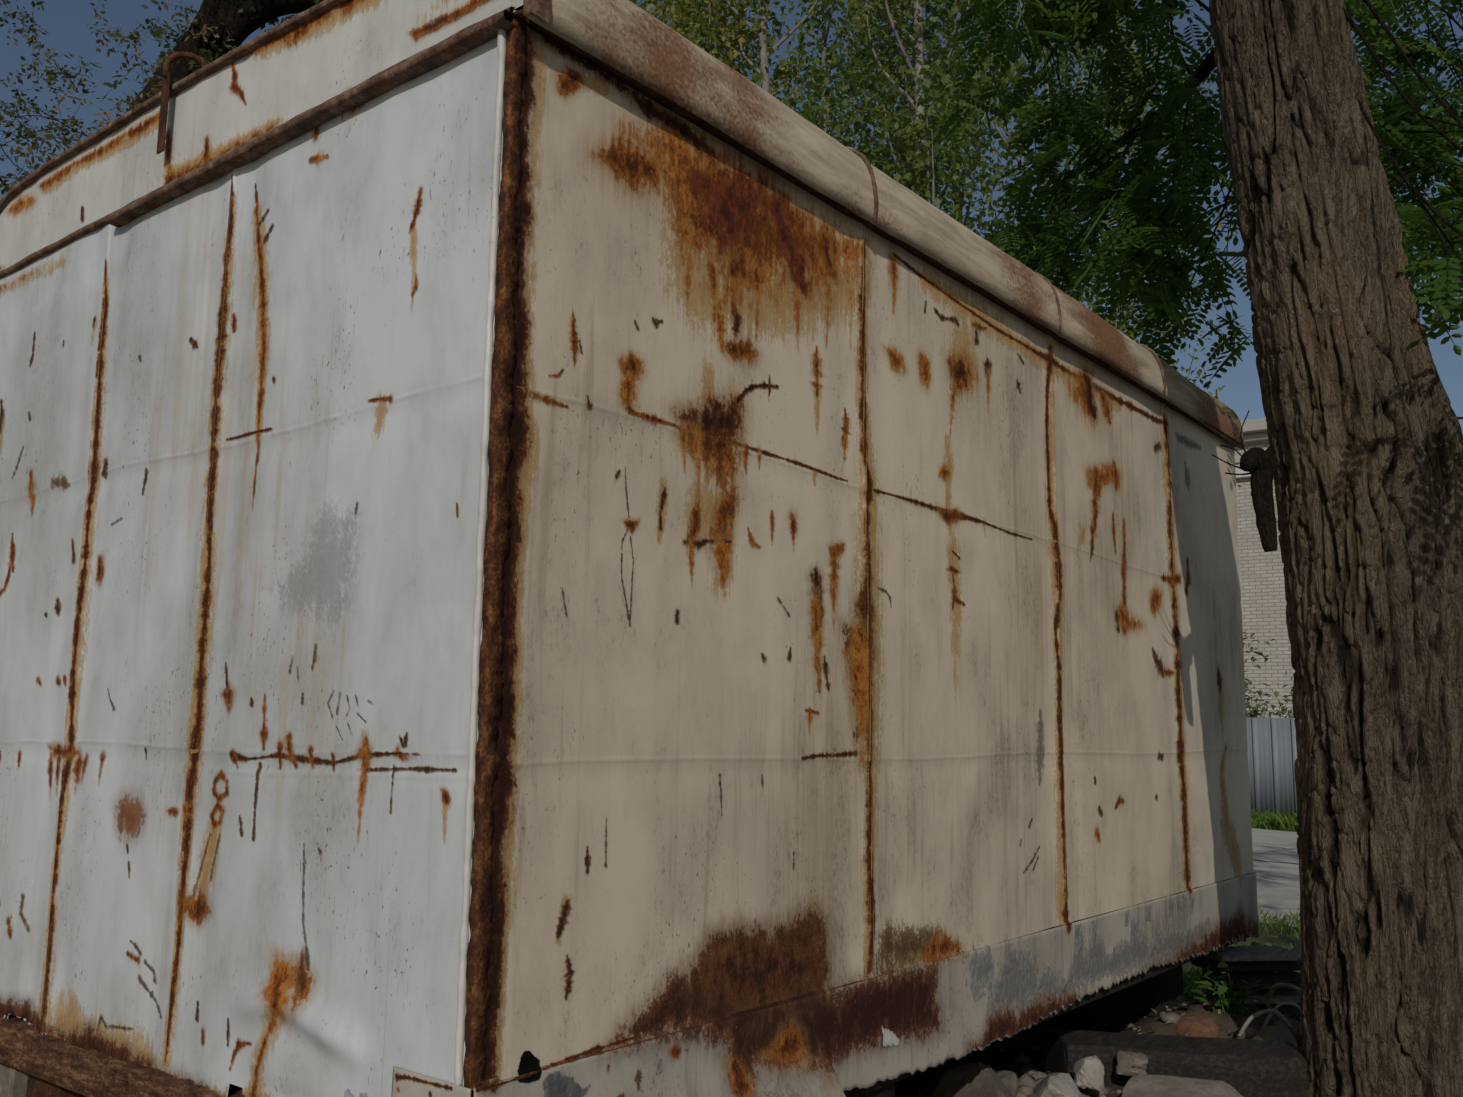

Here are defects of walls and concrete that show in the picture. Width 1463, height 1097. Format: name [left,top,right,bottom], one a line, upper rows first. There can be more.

corrosion [253,0,378,58]
corrosion [409,0,488,40]
corrosion [230,62,246,104]
corrosion [7,111,283,215]
corrosion [308,125,328,163]
corrosion [475,28,1194,1097]
corrosion [0,176,457,1097]
peeling [543,1071,590,1097]